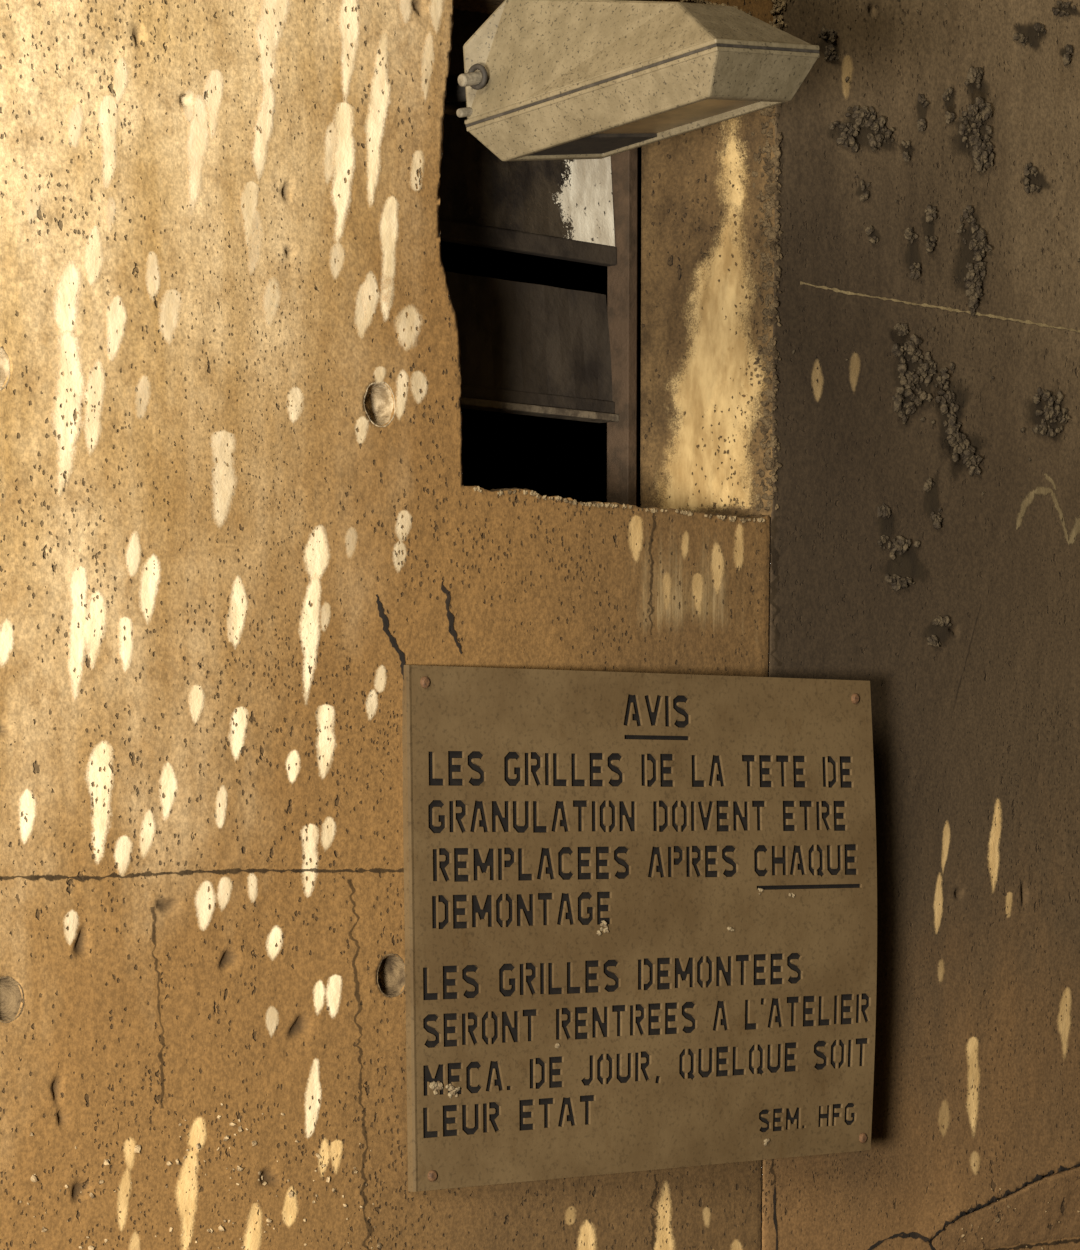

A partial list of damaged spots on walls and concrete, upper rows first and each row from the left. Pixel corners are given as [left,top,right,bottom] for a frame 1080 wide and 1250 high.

spalling [829,105,913,162]
spalling [917,67,994,173]
leakage [657,119,766,510]
spalling [890,323,982,476]
leakage [630,516,642,560]
leakage [712,525,743,589]
spalling [877,503,926,591]
crack [376,594,405,679]
crack [441,581,462,654]
crack [771,1186,779,1250]
crack [868,1163,1080,1250]